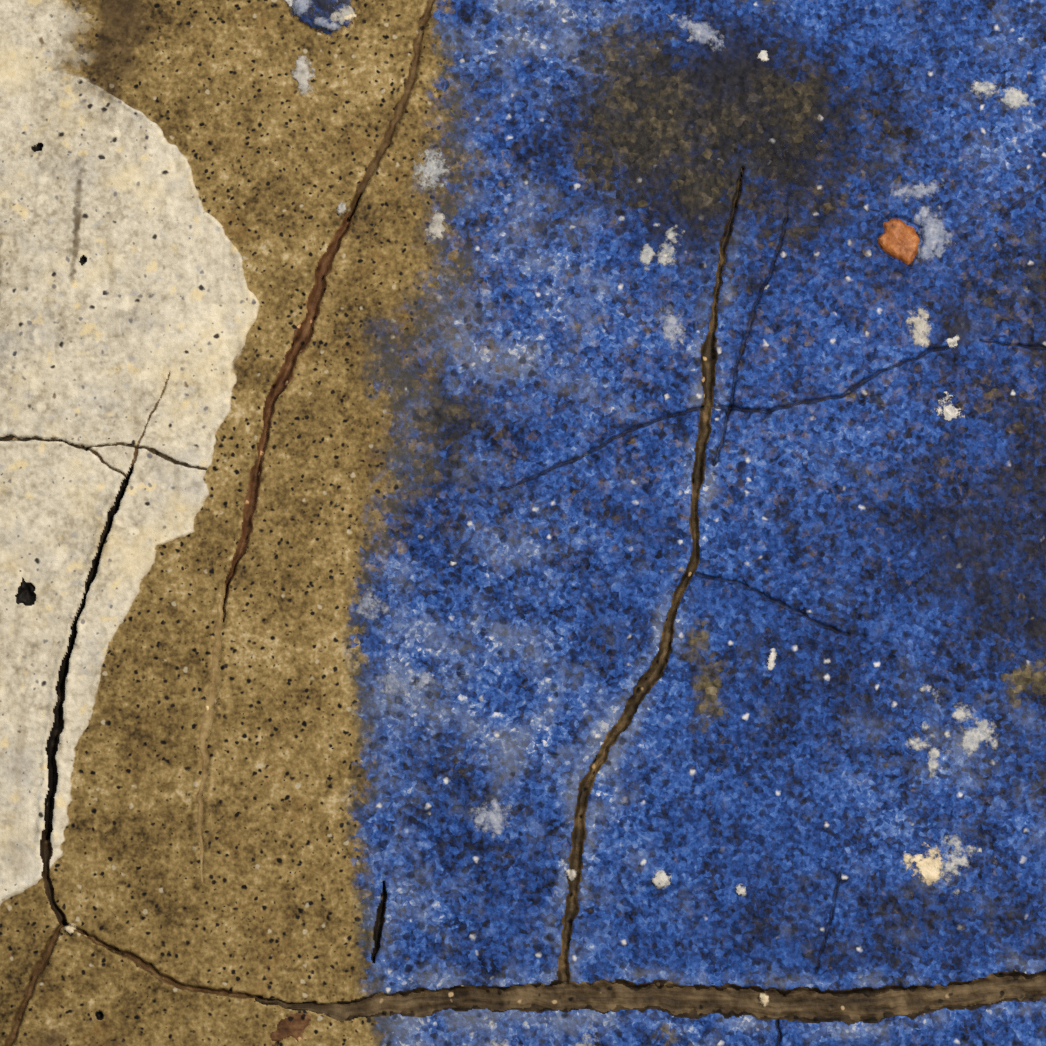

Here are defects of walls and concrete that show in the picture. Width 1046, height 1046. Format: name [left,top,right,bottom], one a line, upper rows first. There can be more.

peeling [292,56,315,94]
peeling [284,0,356,34]
leakage [640,37,773,235]
crack [196,0,435,883]
spalling [15,577,36,606]
crack [76,167,1046,1046]
crack [0,372,207,1046]